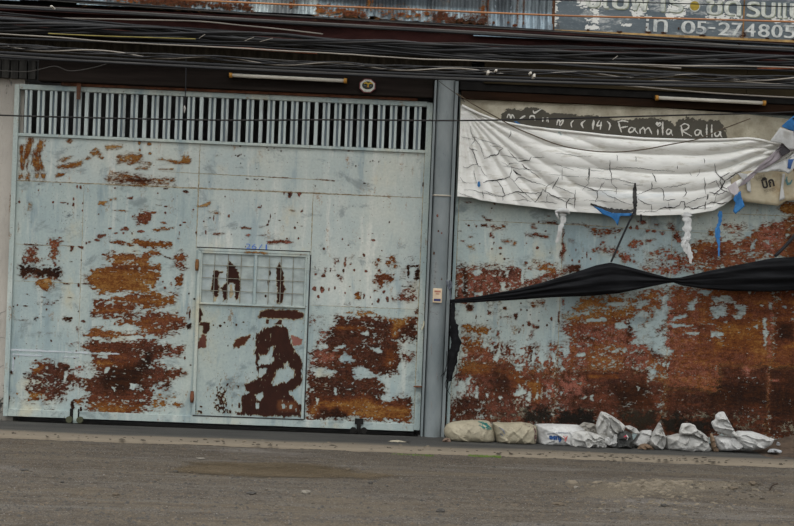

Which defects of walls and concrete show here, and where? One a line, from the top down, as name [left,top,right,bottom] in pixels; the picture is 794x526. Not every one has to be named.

peeling [576,0,603,30]
peeling [620,6,649,27]
peeling [665,0,691,21]
corrosion [18,137,191,215]
corrosion [9,206,192,413]
corrosion [305,250,420,424]
corrosion [445,201,794,439]